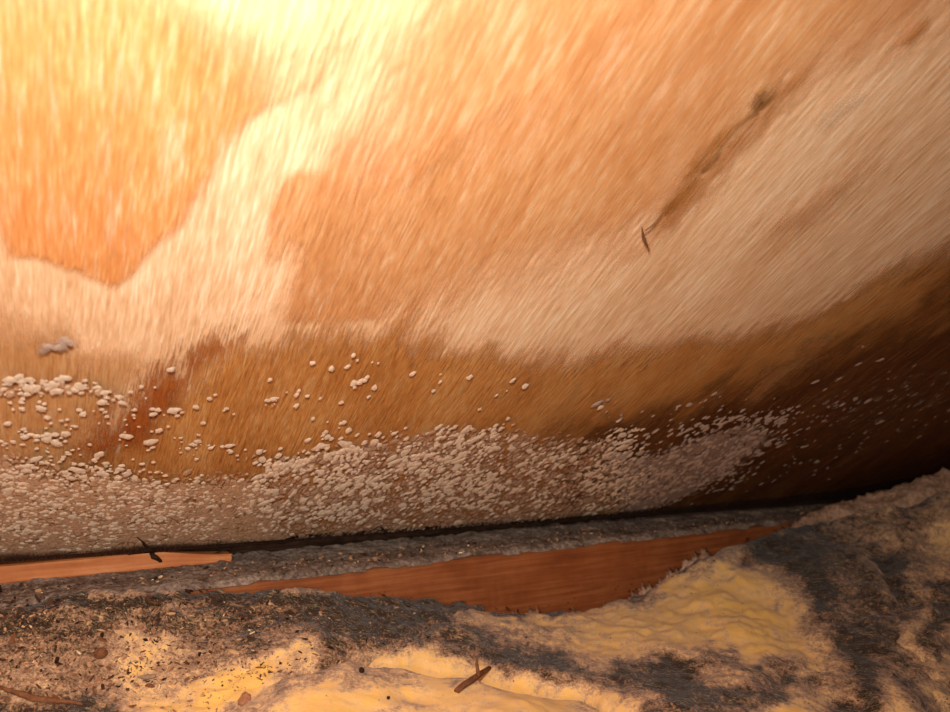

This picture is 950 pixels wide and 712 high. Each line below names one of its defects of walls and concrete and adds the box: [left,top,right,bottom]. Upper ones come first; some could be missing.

leakage [0,0,950,563]